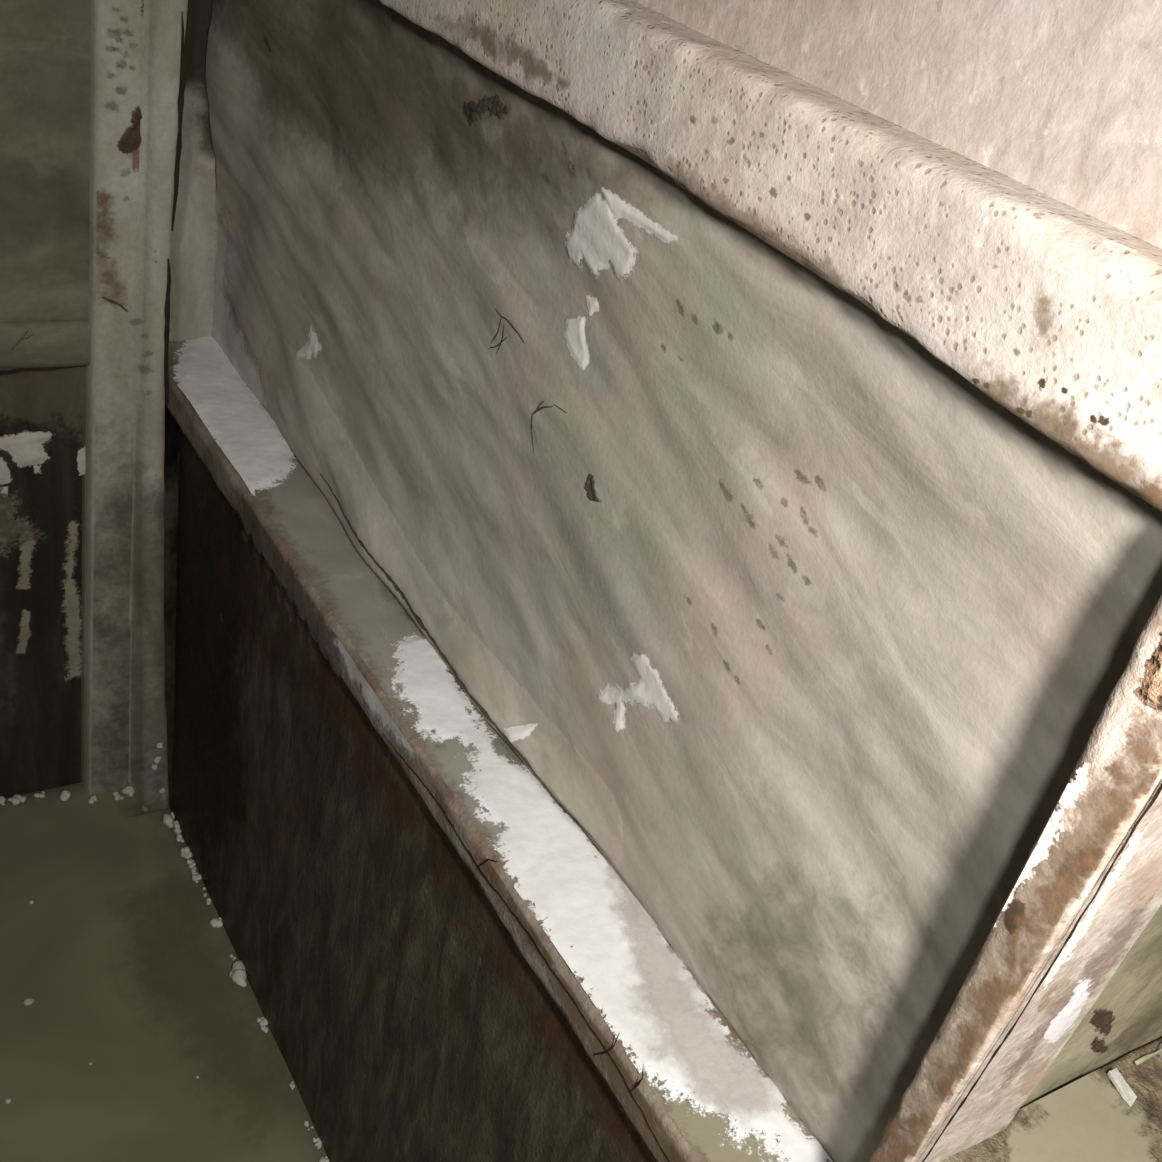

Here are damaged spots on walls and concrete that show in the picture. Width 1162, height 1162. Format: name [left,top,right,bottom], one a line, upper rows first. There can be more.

corrosion [96,193,113,237]
crack [489,309,524,355]
flaking render [0,431,52,558]
flaking render [77,447,85,476]
crack [531,401,567,453]
damp [988,380,1137,483]
damp [1147,496,1162,512]
damp [151,0,833,1162]
corrosion [1042,713,1161,926]
corrosion [939,914,1037,1101]
damp [877,773,1159,1162]
corrosion [871,1114,929,1162]